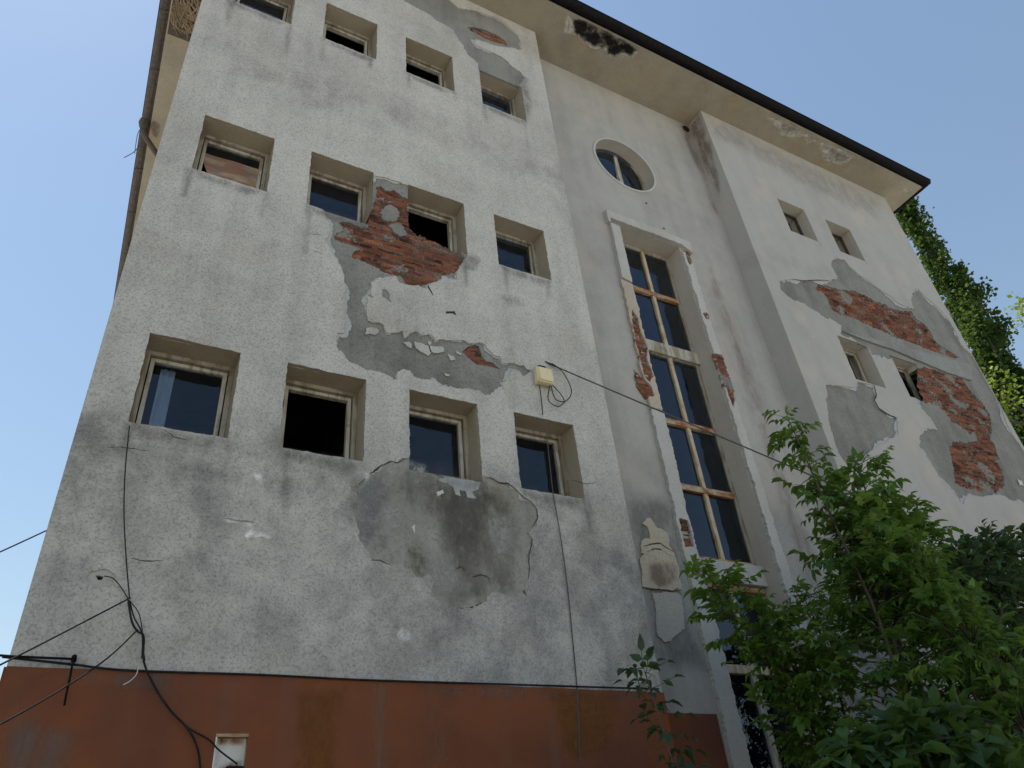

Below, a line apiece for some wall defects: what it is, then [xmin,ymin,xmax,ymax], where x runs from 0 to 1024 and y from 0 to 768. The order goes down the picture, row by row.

flaking render [404,0,524,88]
water stain [564,15,638,57]
flaking render [323,176,531,395]
flaking render [632,312,653,400]
flaking render [712,353,735,405]
flaking render [780,258,1024,504]
flaking render [355,458,538,609]
flaking render [679,519,693,547]